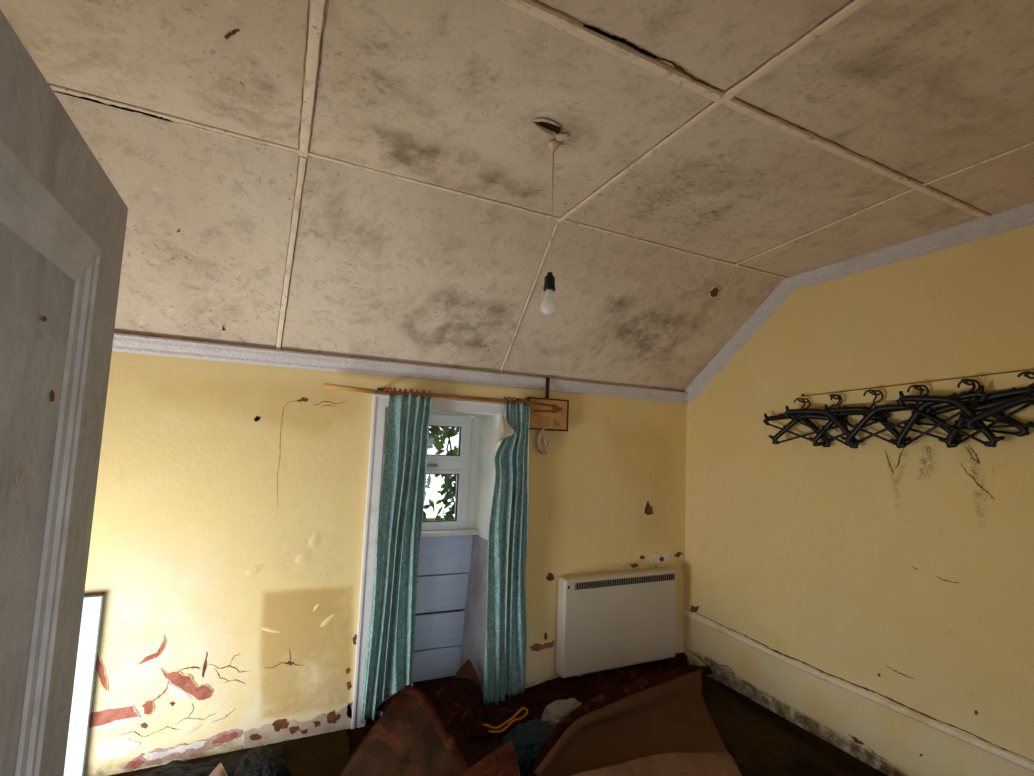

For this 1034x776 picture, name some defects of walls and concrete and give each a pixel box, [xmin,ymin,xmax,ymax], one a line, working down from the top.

crack [583,24,709,86]
crack [53,91,178,124]
damp [961,445,994,499]
crack [210,654,248,684]
crack [119,703,234,737]
flaking render [89,635,353,772]
damp [704,658,905,776]